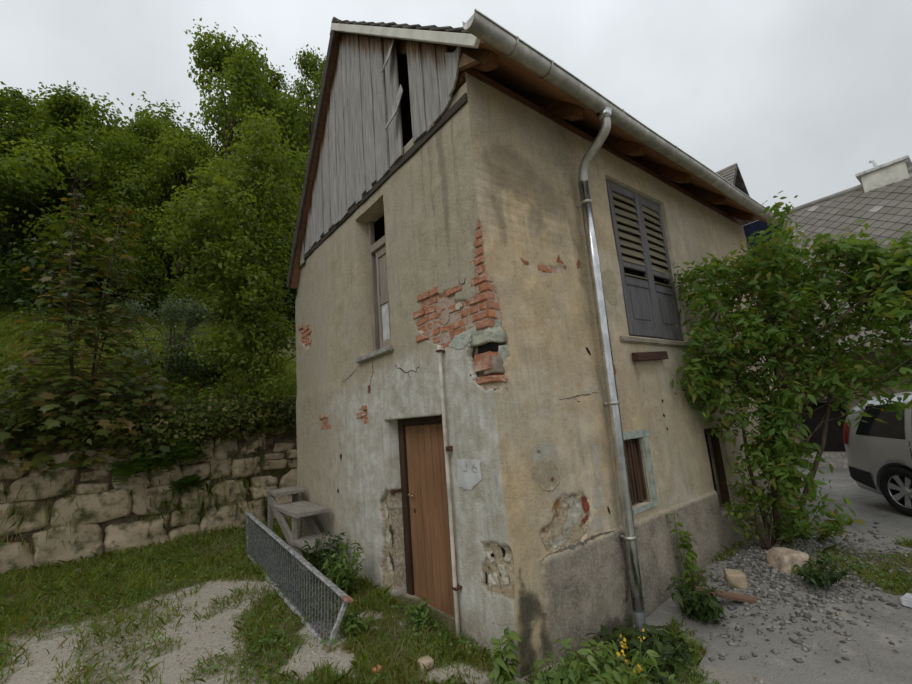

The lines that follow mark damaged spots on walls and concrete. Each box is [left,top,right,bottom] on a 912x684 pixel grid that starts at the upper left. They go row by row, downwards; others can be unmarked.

flaking render [521,255,566,274]
flaking render [413,221,509,391]
crack [340,363,420,384]
flaking render [356,405,369,424]
flaking render [381,492,396,588]
flaking render [484,543,514,598]
flaking render [539,493,615,562]
damp [518,593,551,678]